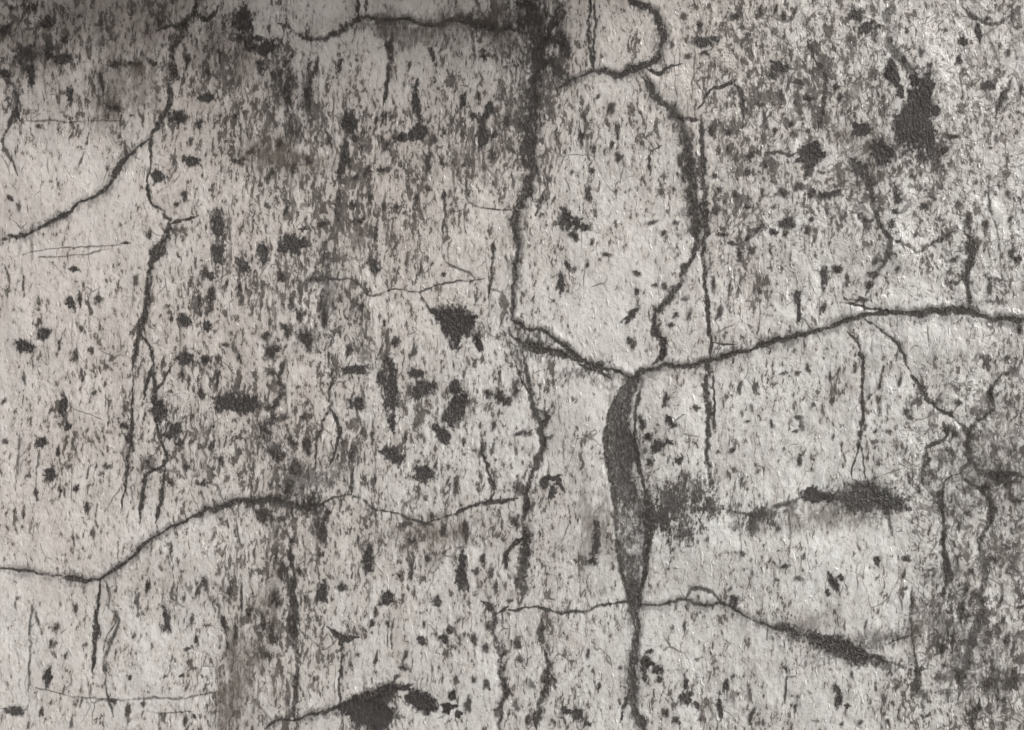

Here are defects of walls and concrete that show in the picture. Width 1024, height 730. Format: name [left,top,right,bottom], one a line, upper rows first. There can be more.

crack [1,0,219,523]
crack [0,442,519,730]
crack [275,0,516,106]
crack [480,0,1024,730]